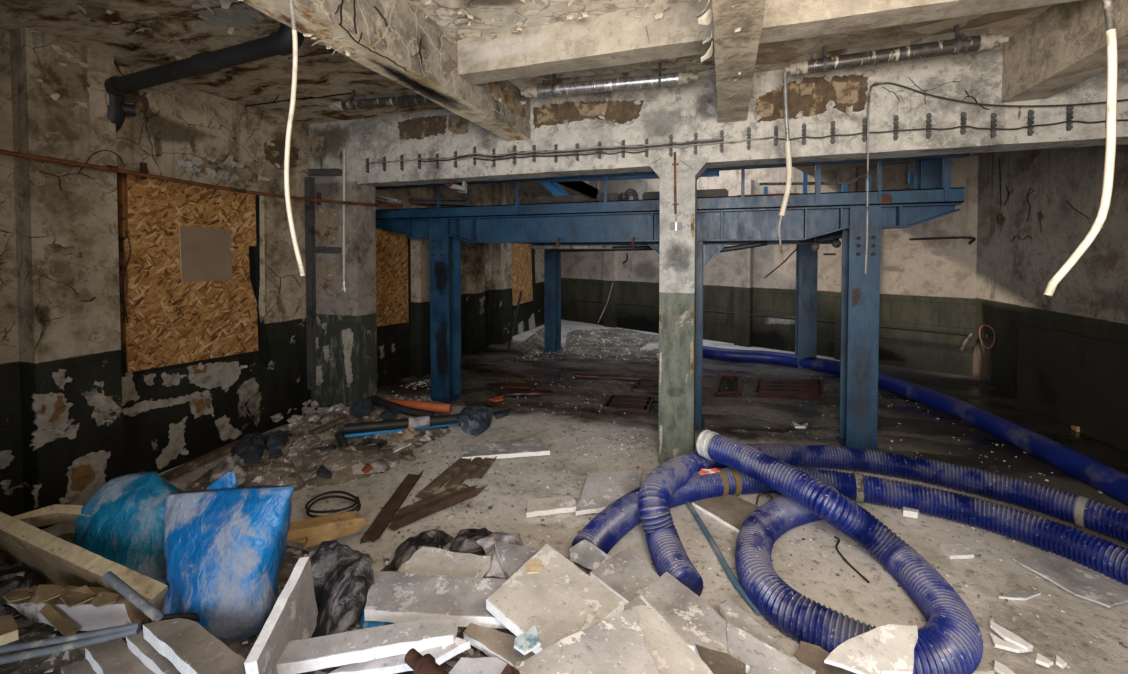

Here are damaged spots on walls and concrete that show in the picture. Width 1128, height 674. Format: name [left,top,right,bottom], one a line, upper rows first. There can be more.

spalling [398,113,469,140]
spalling [485,82,644,129]
spalling [752,69,876,122]
crack [38,168,95,190]
peeling [176,139,300,185]
crack [44,276,96,302]
peeling [316,322,354,388]
peeling [29,369,79,451]
peeling [95,361,248,470]
peeling [0,450,15,495]
peeling [59,450,111,506]
flaking render [430,377,679,545]